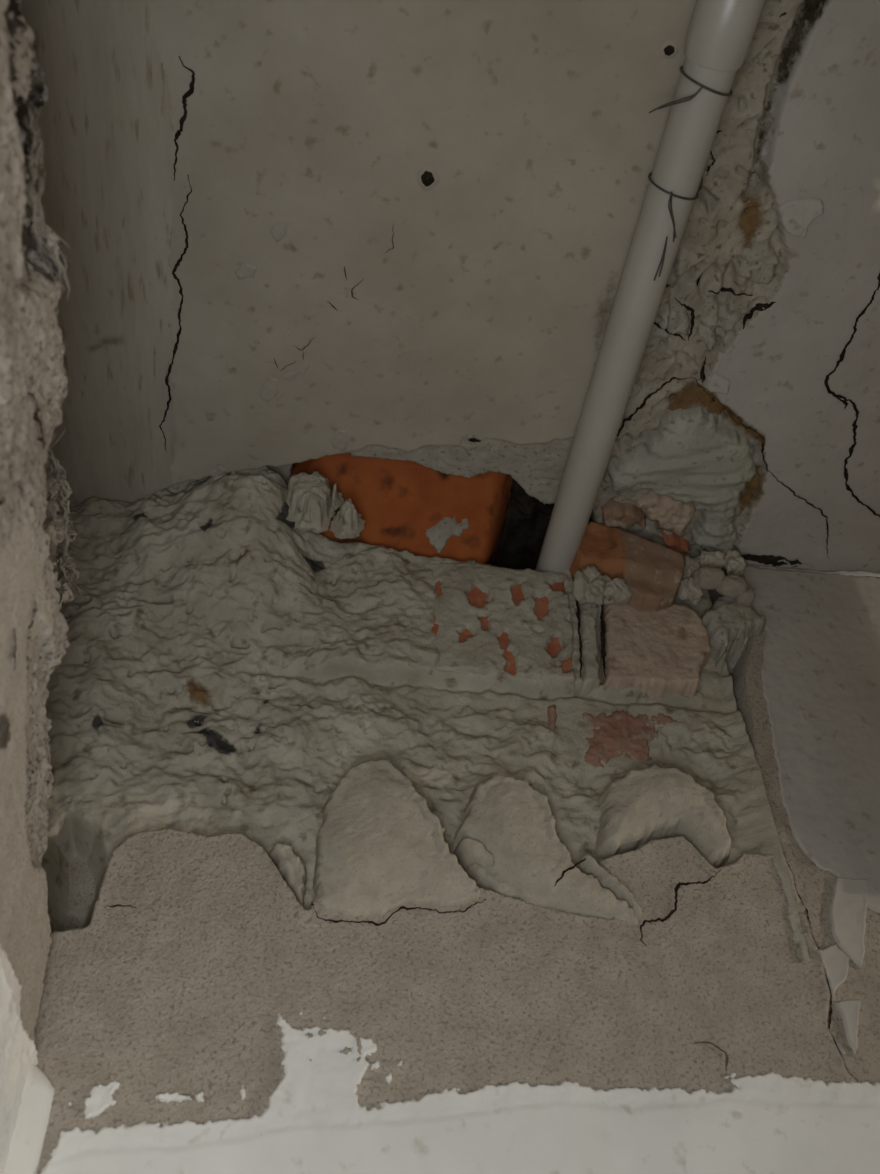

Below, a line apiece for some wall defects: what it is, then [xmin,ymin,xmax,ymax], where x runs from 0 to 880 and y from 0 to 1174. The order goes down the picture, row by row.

crack [159,56,195,450]
crack [616,275,829,558]
crack [824,273,880,517]
spalling [25,458,880,1054]
crack [555,858,586,886]
crack [640,870,721,946]
peeling [40,1011,880,1174]